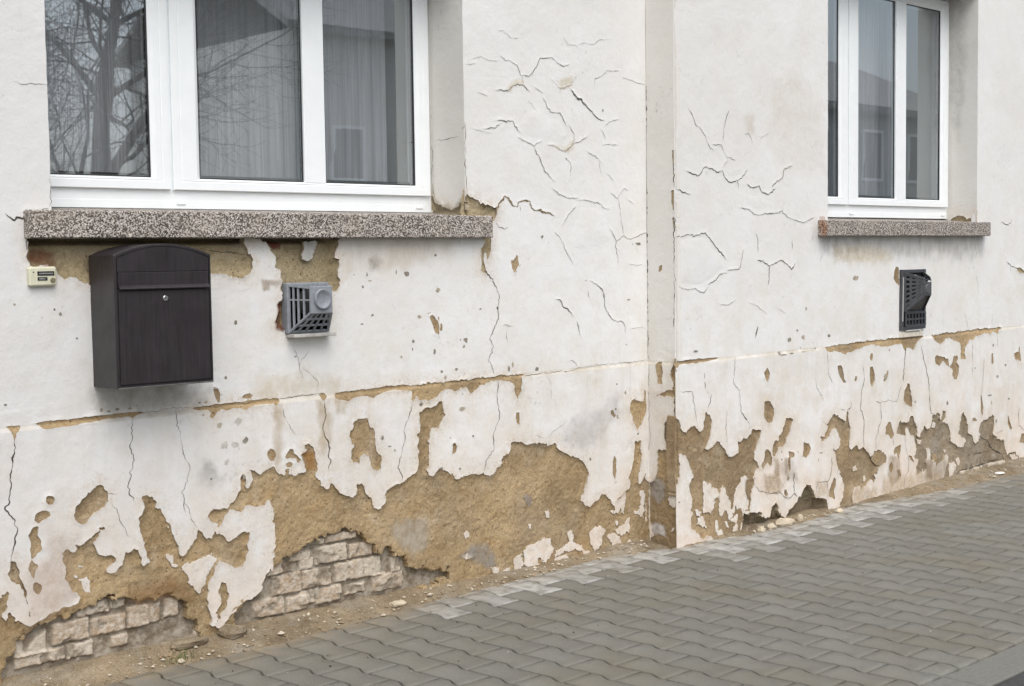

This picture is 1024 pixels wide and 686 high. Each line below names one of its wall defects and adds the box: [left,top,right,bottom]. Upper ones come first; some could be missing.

spalling [26,238,340,326]
crack [431,30,651,466]
crack [673,110,812,334]
crack [4,443,18,563]
crack [110,407,197,533]
spalling [0,350,1024,685]
crack [755,460,832,499]
crack [816,351,932,487]
crack [959,413,1023,472]